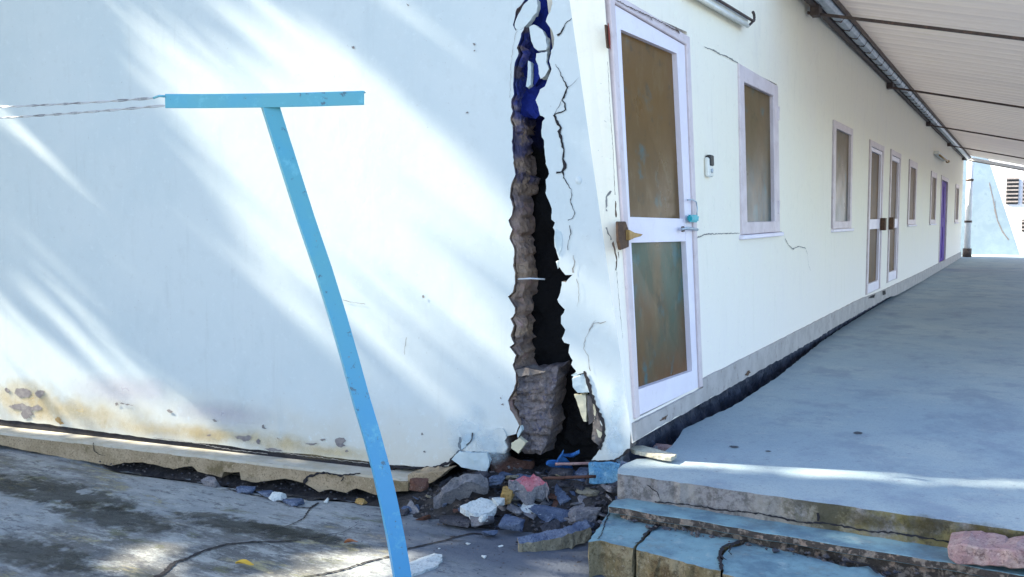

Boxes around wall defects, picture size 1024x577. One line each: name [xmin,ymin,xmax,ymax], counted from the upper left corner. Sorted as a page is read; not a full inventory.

crack [510,0,631,468]
peeling [4,388,45,419]
crack [0,419,453,484]
crack [636,485,949,543]
crack [717,539,746,570]
crack [839,560,879,574]